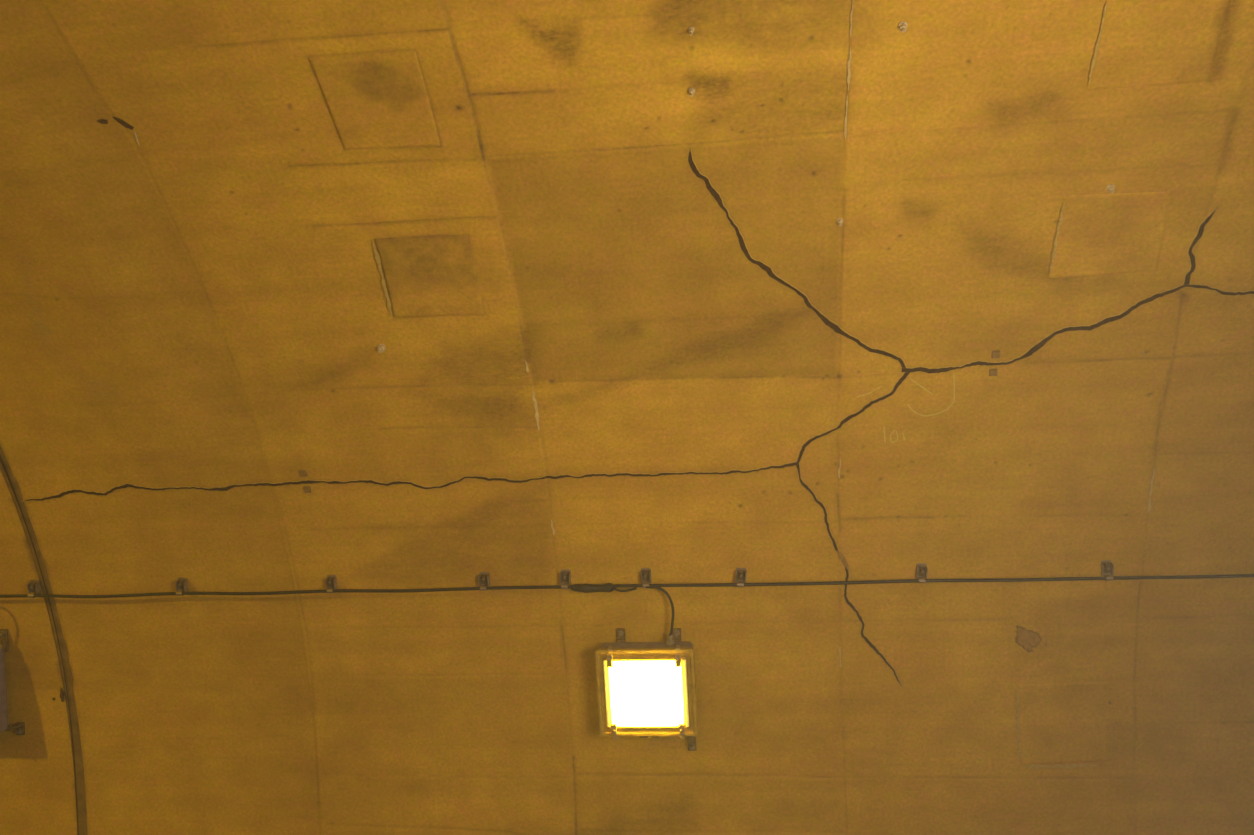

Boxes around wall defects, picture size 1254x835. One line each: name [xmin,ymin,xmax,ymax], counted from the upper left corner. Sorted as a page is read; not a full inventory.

crack [22,148,1254,687]